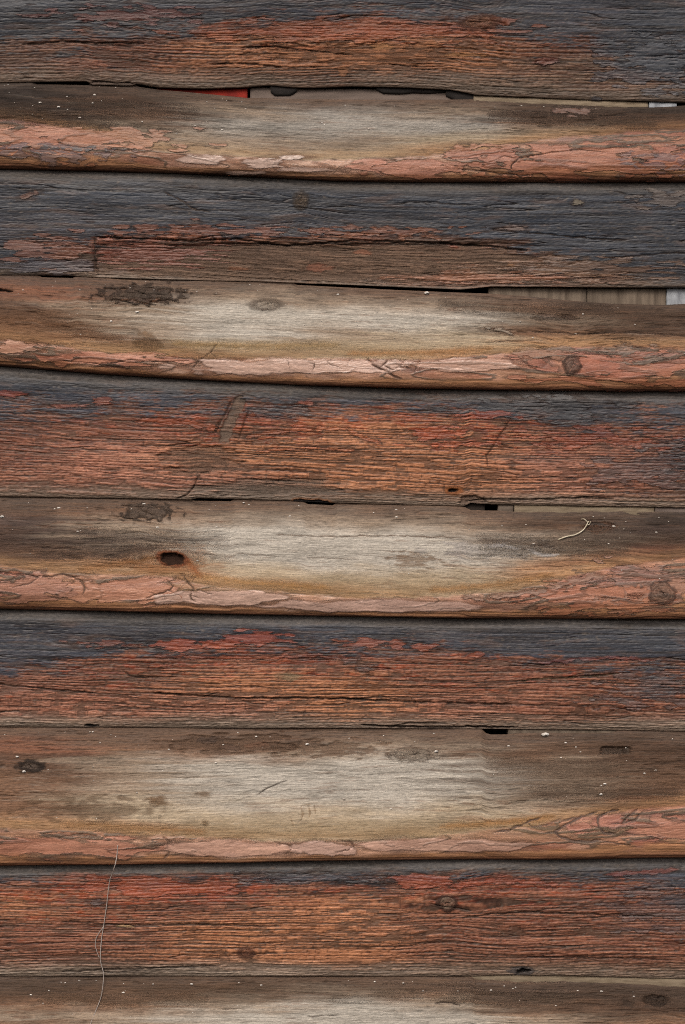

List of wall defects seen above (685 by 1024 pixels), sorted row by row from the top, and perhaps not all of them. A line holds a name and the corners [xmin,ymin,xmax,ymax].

peeling [582,21,685,97]
peeling [244,400,381,453]
peeling [406,391,685,498]
spalling [194,479,343,495]
peeling [58,628,315,653]
peeling [332,637,439,672]
peeling [537,655,685,711]
peeling [78,868,559,906]
peeling [594,867,685,934]